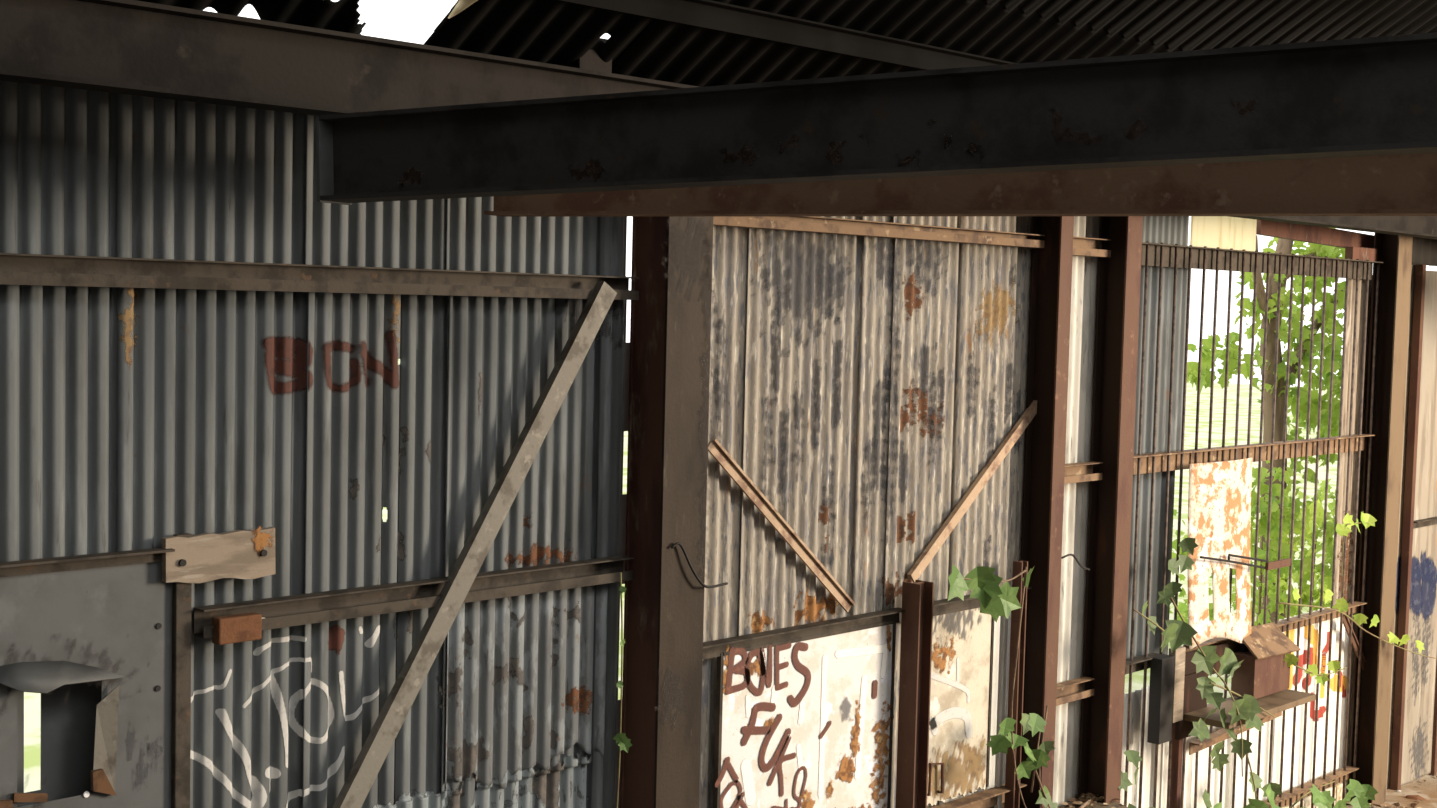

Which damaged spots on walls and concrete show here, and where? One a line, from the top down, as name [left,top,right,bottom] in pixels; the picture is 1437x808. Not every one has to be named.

leakage [710,308,730,444]
leakage [762,293,843,541]
leakage [861,251,945,544]
leakage [968,325,1021,453]
peeling [436,628,474,708]
peeling [493,657,528,691]
peeling [552,601,581,666]
corrosion [794,589,839,626]
corrosion [1188,458,1253,650]
peeling [373,716,591,808]
corrosion [798,700,894,808]
corrosion [927,739,986,800]